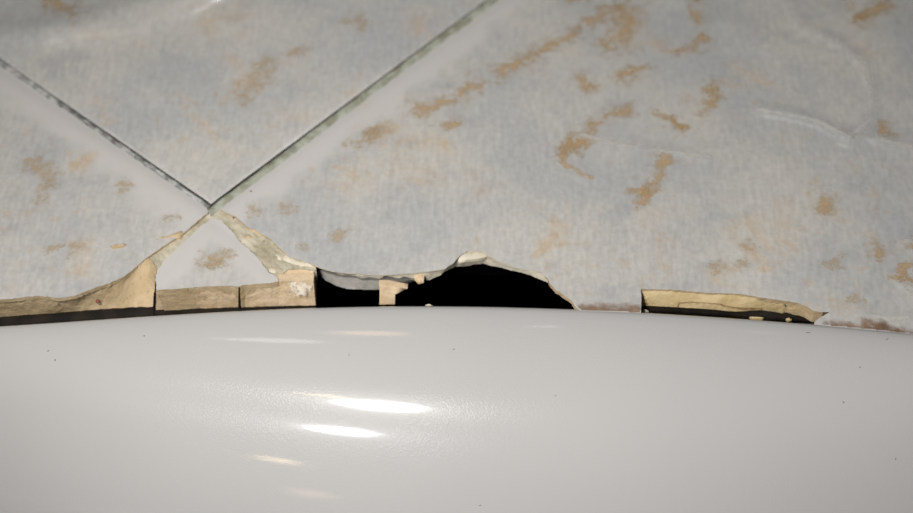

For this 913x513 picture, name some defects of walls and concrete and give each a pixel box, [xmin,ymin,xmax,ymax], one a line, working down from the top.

spalling [0,258,164,317]
spalling [195,252,548,308]
peeling [641,291,813,322]
corrosion [827,322,913,334]